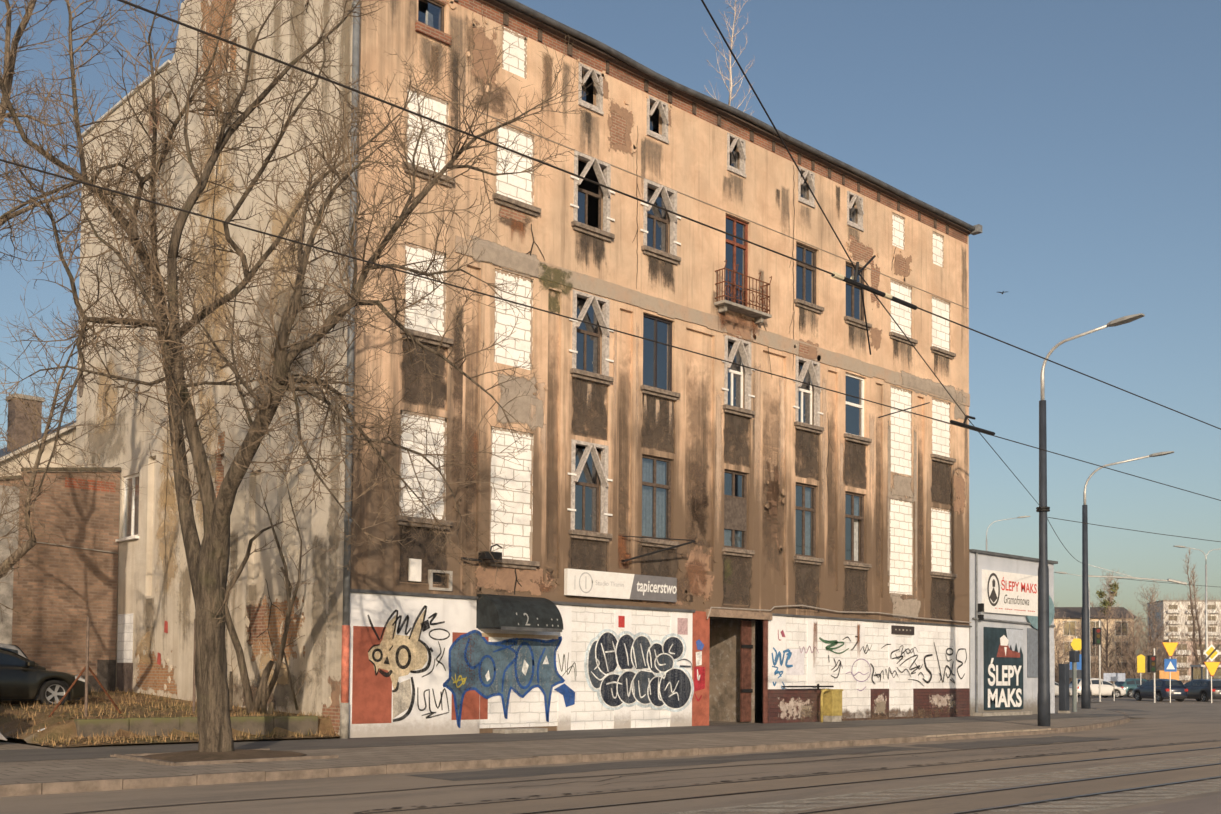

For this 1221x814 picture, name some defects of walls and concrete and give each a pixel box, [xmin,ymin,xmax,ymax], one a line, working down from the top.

spalling [198,0,240,119]
flaking render [466,19,507,113]
flaking render [601,71,637,157]
water stain [580,234,605,264]
water stain [649,257,674,284]
flaking render [846,235,913,310]
flaking render [869,327,882,350]
water stain [716,366,761,500]
spalling [244,591,305,664]